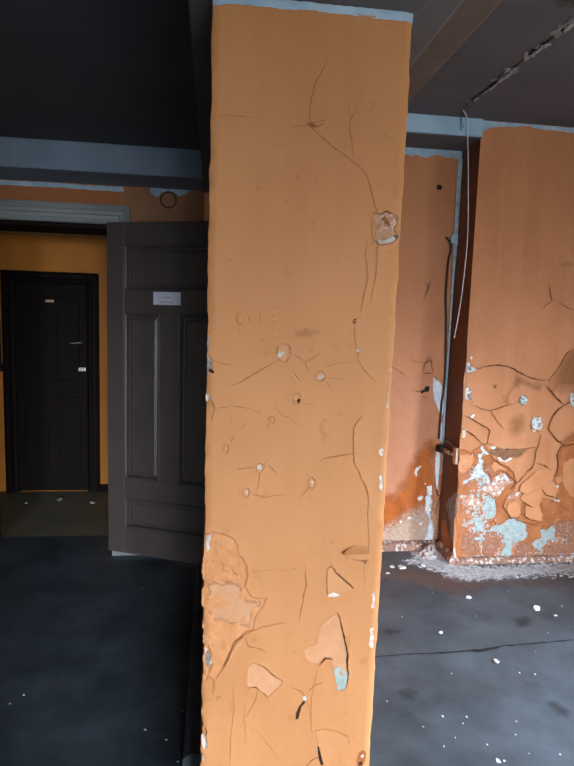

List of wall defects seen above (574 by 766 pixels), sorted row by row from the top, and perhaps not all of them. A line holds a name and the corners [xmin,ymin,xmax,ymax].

crack [465,15,574,107]
peeling [233,121,574,565]
crack [327,419,369,500]
crack [466,404,511,443]
crack [480,364,574,489]
peeling [343,528,370,581]
peeling [202,532,283,694]
peeling [246,664,283,717]
crack [293,683,322,720]
peeling [304,613,350,731]
crack [376,640,569,657]
crack [310,729,349,766]